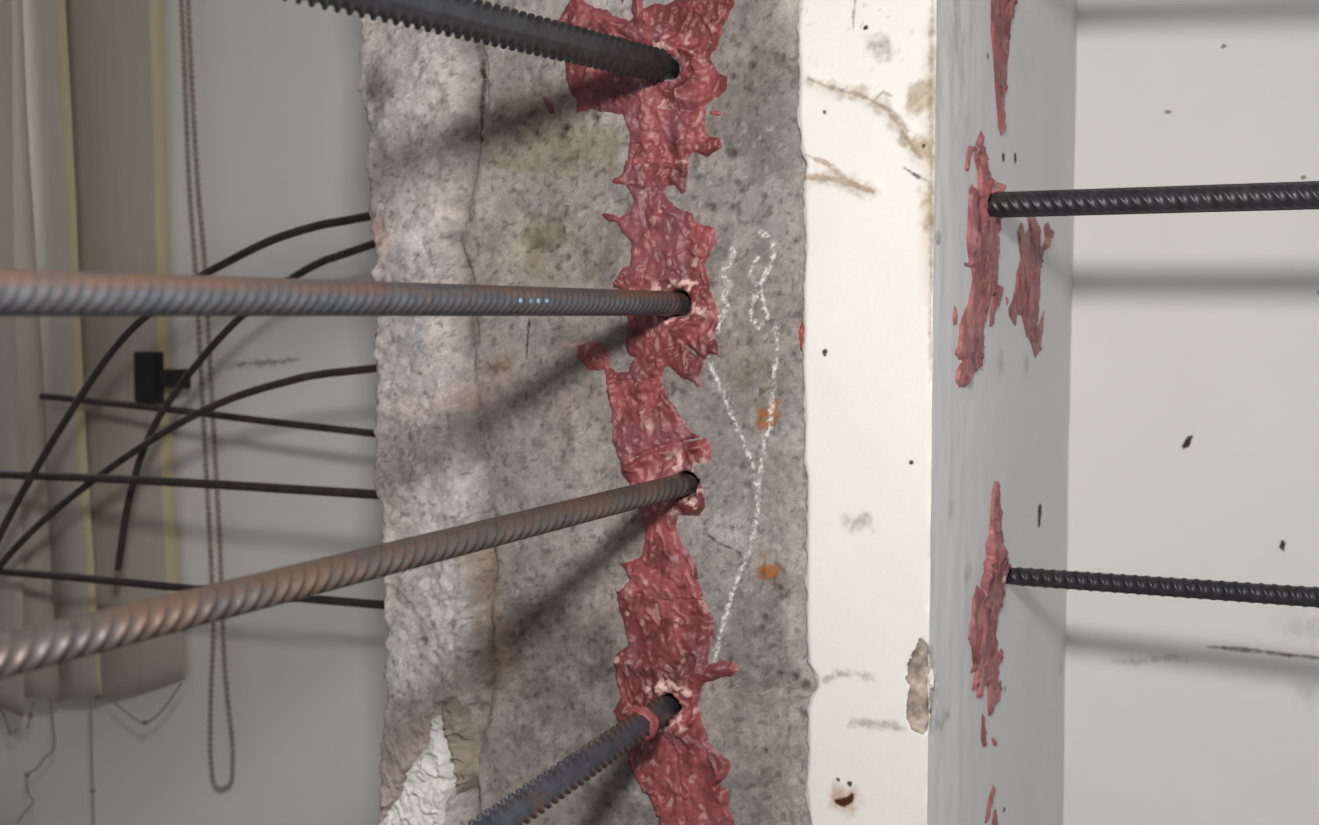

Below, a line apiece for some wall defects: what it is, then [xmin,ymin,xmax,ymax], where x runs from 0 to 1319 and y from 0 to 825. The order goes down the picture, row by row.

peeling [989,285,1009,328]
spalling [442,695,480,796]
peeling [981,715,997,747]